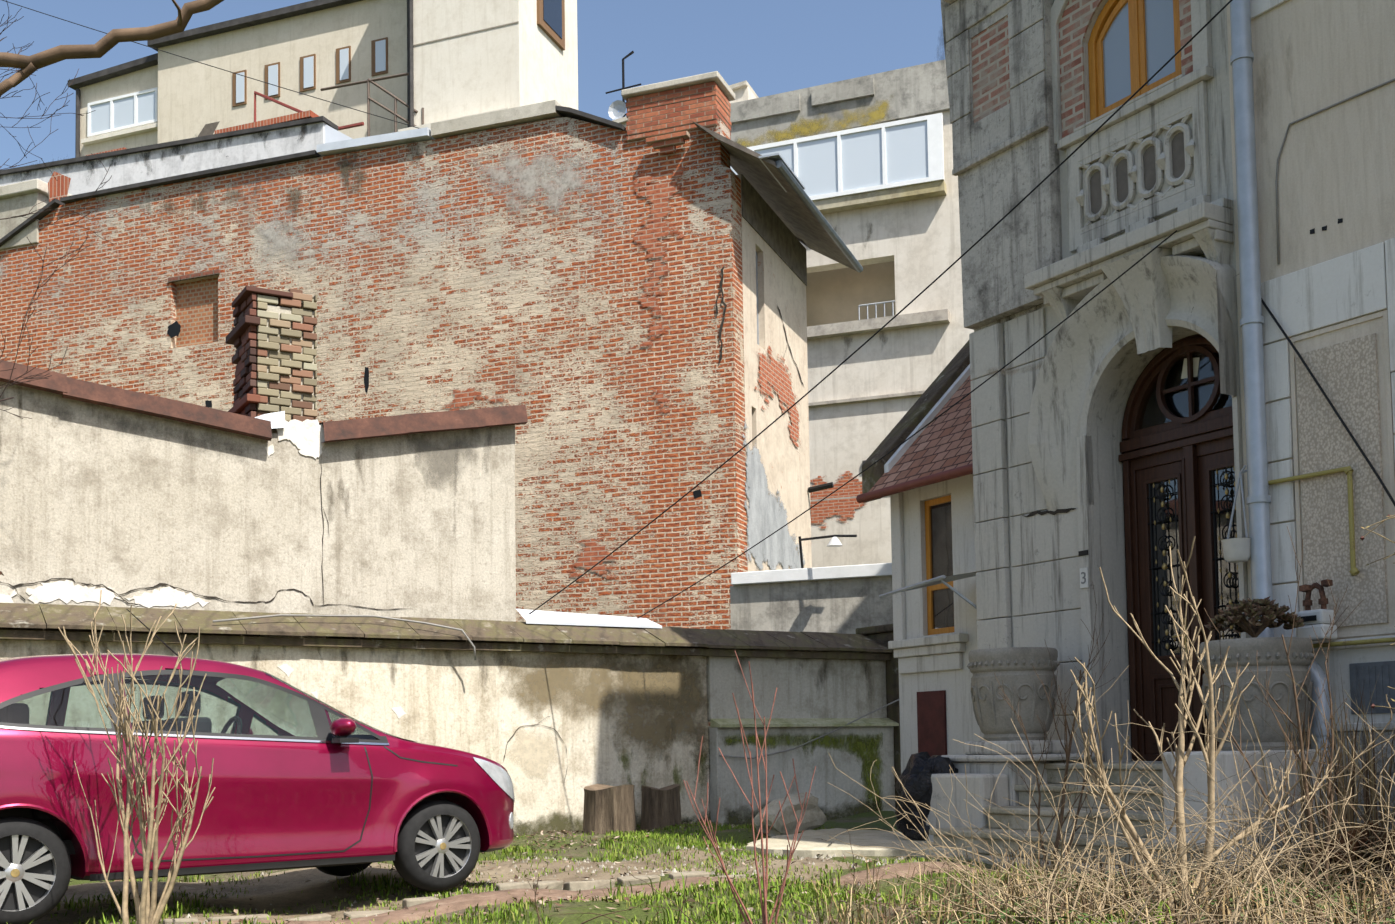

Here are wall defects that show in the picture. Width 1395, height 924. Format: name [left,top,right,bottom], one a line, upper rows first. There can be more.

spalling [167,321,181,338]
crack [716,267,727,363]
flaking render [442,386,504,411]
flaking render [755,345,801,452]
flaking render [265,419,325,459]
flaking render [810,471,866,529]
flaking render [0,579,209,608]
leakage [500,653,710,773]
leakage [726,734,882,810]